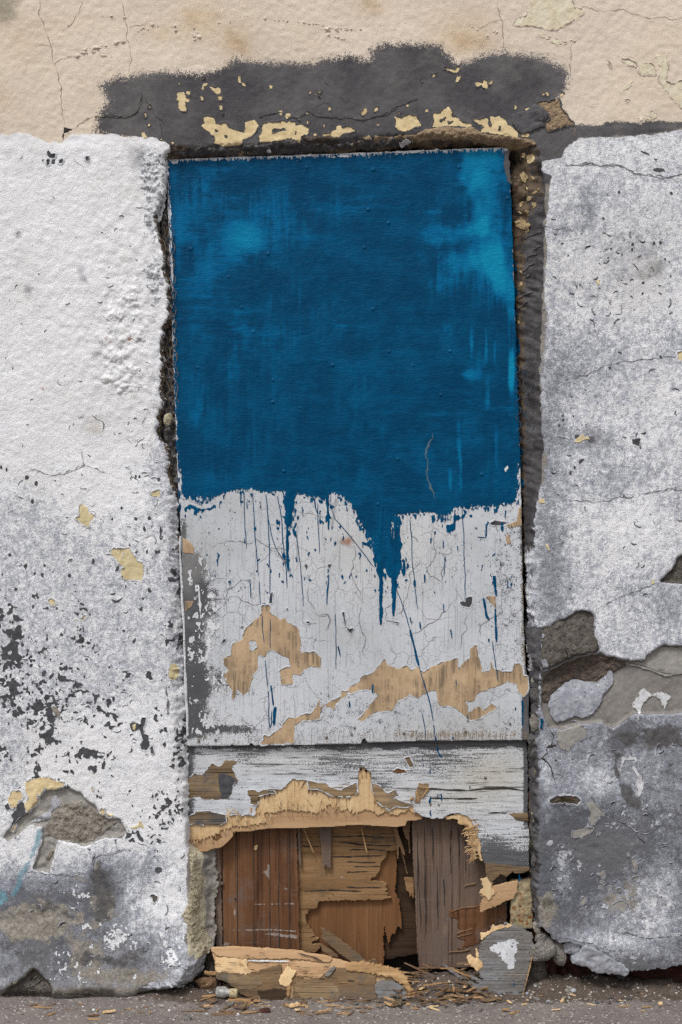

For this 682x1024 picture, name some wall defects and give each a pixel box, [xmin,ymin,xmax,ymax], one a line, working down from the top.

spalling [141,76,576,232]
peeling [544,390,609,487]
peeling [216,591,322,701]
spalling [341,611,355,636]
crack [351,535,498,653]
spalling [643,554,682,596]
spalling [259,643,682,779]
spalling [0,558,275,998]
peeling [307,780,413,811]
peeling [279,964,296,996]